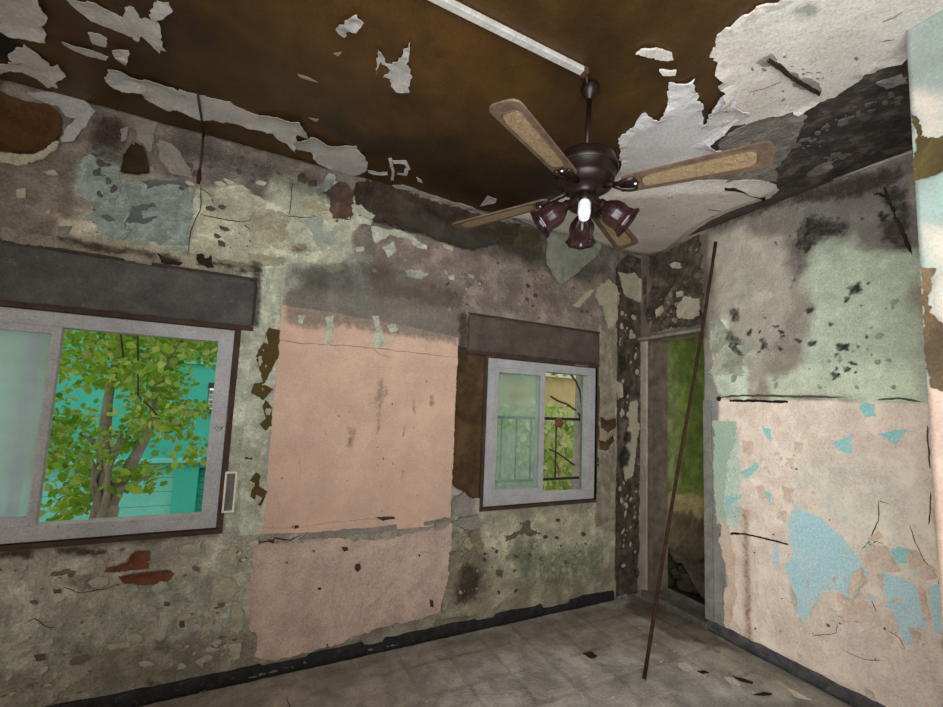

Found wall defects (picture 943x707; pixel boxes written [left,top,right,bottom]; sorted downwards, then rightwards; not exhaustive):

flaking render [614,0,943,192]
flaking render [0,0,522,281]
water stain [793,169,909,248]
water stain [197,261,261,326]
peeling [251,318,280,431]
water stain [288,283,469,359]
flaking render [424,228,760,628]
water stain [725,329,767,356]
crack [718,392,845,400]
crack [878,395,921,403]
crack [924,426,932,467]
crack [910,493,939,584]